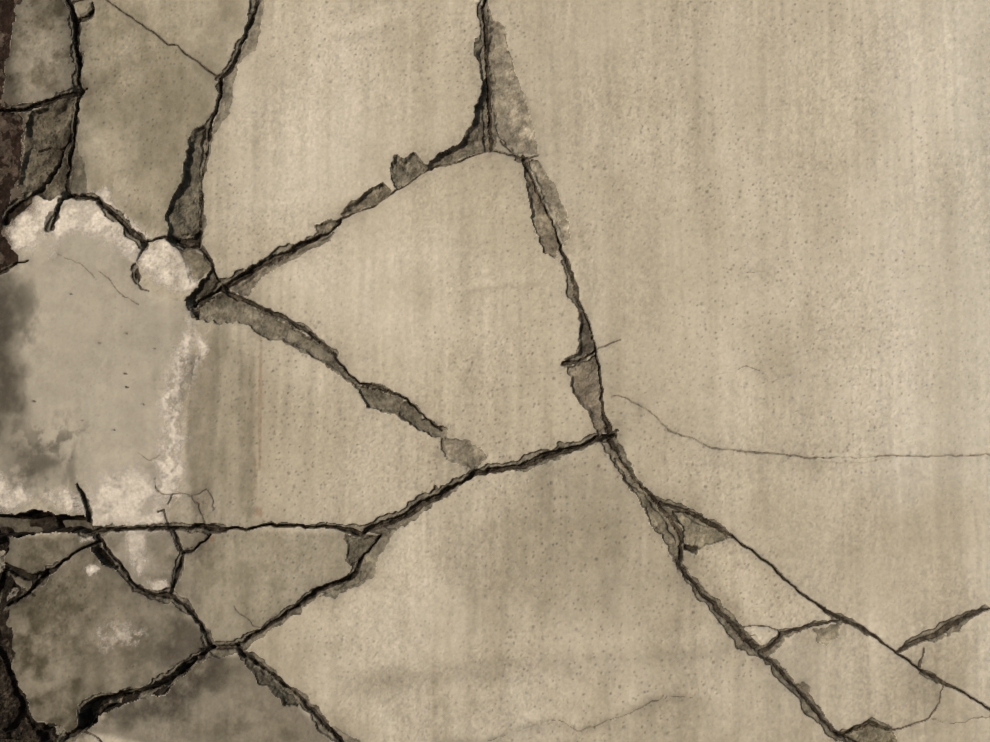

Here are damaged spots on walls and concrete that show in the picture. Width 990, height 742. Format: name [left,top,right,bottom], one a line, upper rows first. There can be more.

spalling [0,0,87,271]
leakage [9,187,197,291]
crack [0,0,443,431]
crack [385,153,482,199]
spalling [305,6,570,259]
crack [469,0,621,434]
leakage [0,480,28,510]
spalling [0,509,88,742]
leakage [43,321,208,573]
leakage [152,581,167,590]
crack [0,429,990,742]
crack [614,395,990,464]